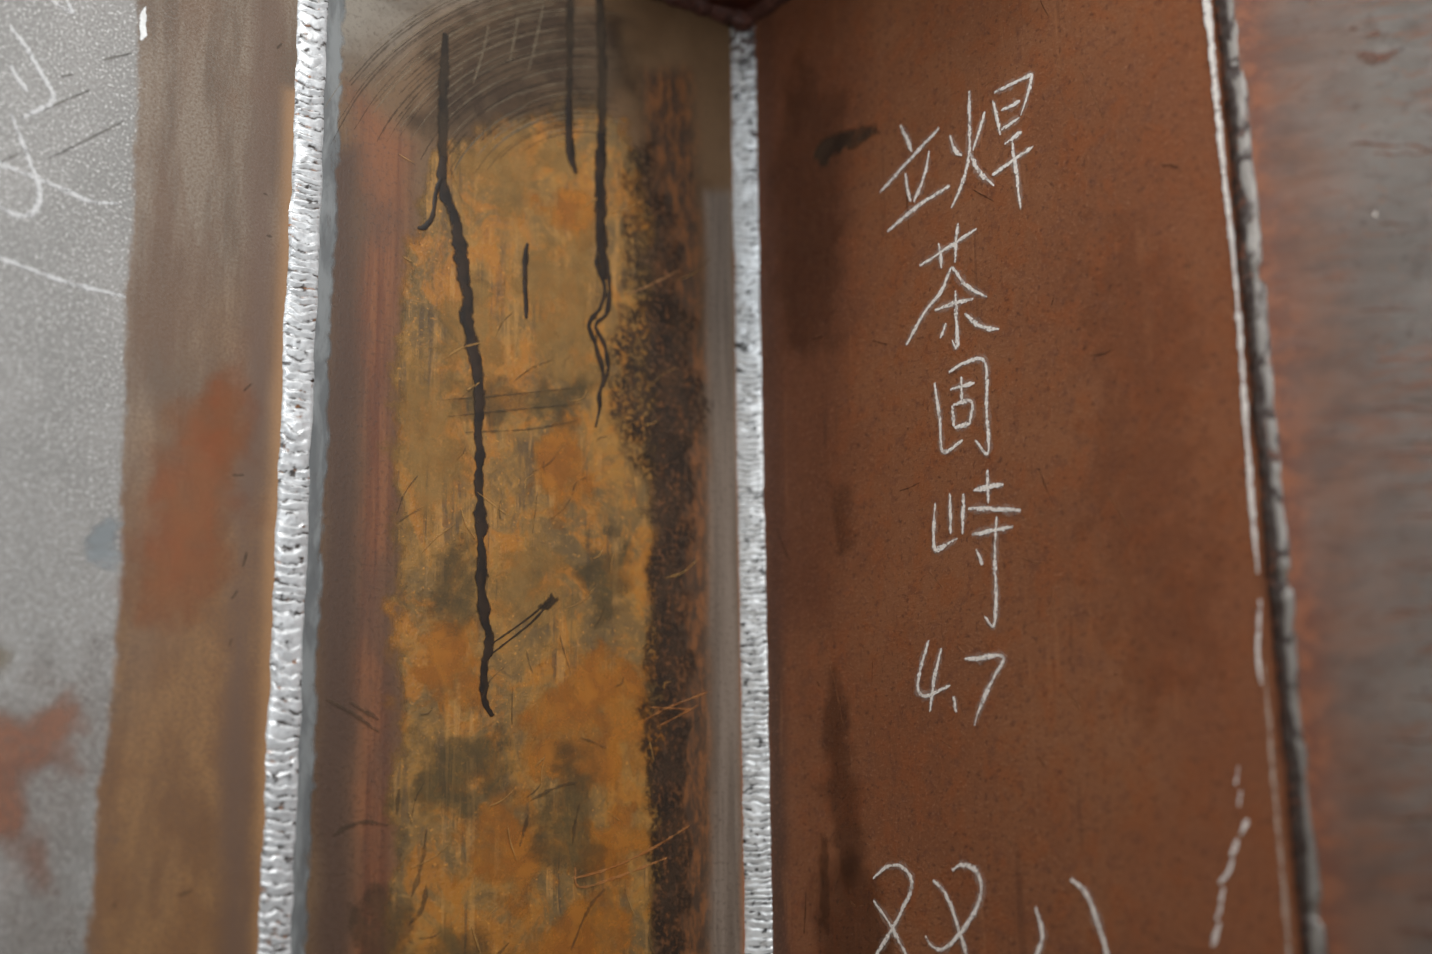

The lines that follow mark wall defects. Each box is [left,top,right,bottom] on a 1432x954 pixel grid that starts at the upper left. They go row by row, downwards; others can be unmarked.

rust [0,704,77,835]
rust [384,98,663,954]